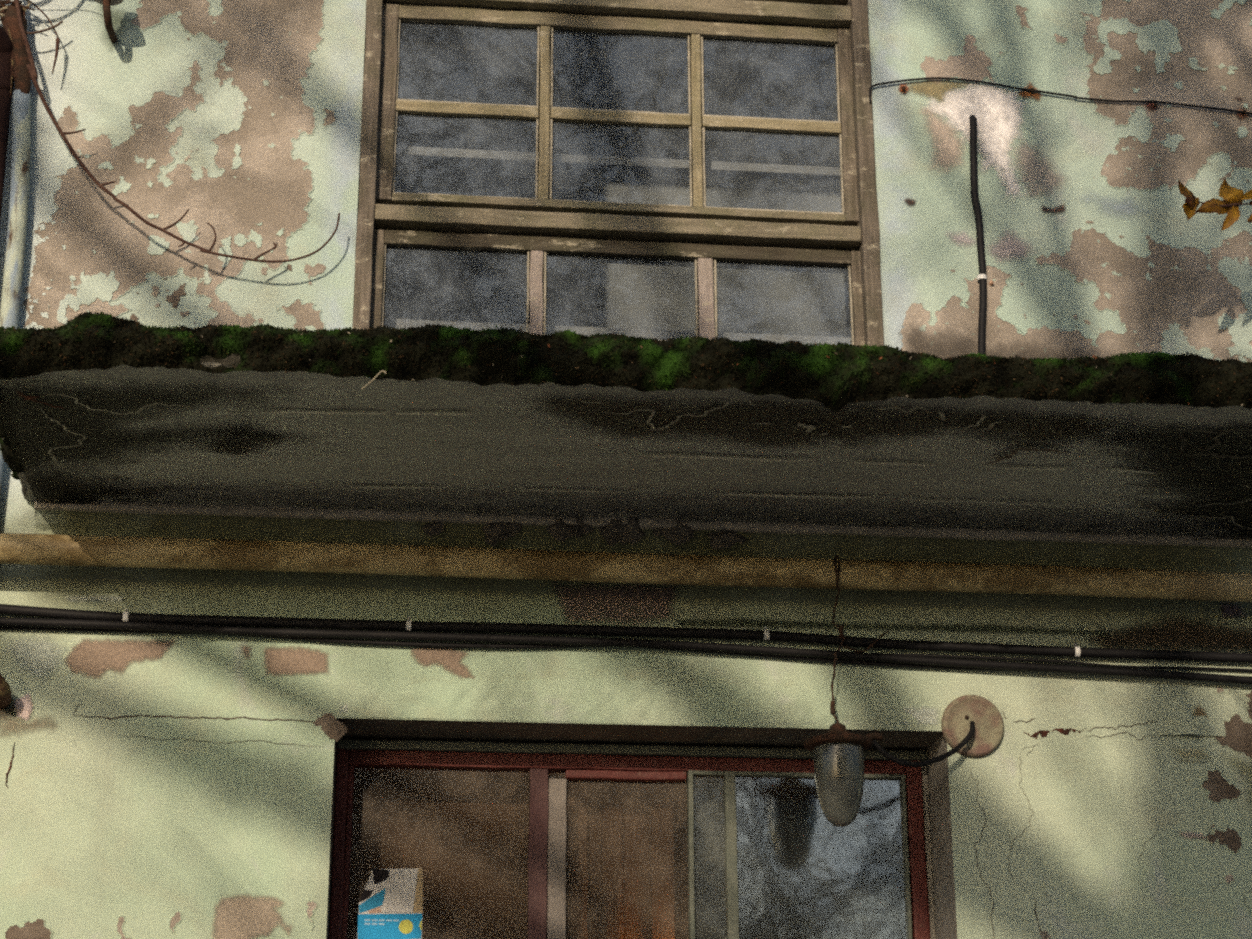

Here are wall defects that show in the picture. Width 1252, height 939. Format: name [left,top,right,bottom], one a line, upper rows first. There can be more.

peeling [21,0,338,331]
leakage [910,81,964,167]
peeling [1053,0,1252,198]
peeling [897,221,1252,362]
leakage [0,381,472,505]
leakage [543,398,1252,540]
peeling [66,640,174,678]
crack [73,704,320,747]
peeling [411,647,474,679]
peeling [1213,685,1252,760]
crack [967,710,1205,939]
peeling [4,917,54,939]